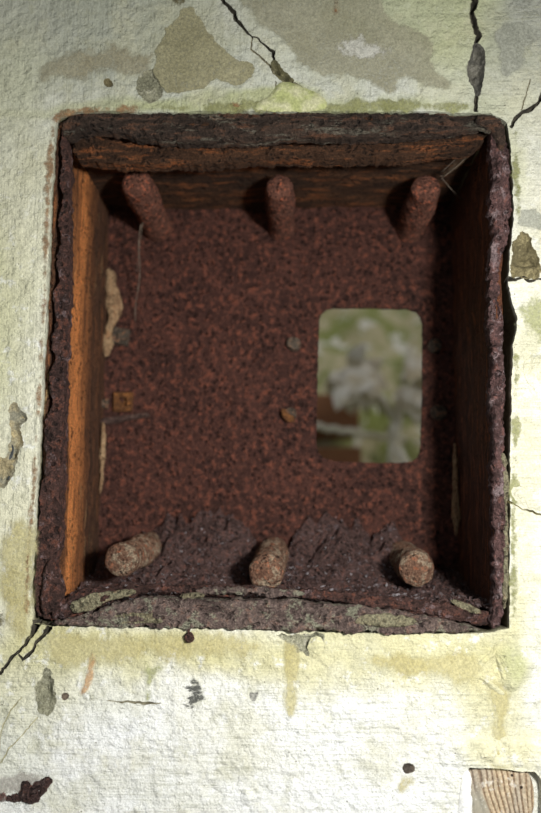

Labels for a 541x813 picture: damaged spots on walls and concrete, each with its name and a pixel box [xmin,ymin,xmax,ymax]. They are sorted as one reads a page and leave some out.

peeling [136,7,255,103]
crack [221,0,304,88]
leakage [242,0,449,93]
crack [469,0,482,46]
crack [509,80,541,128]
corrosion [43,144,54,258]
flaking render [510,209,541,280]
flaking render [0,402,28,488]
crack [0,619,53,675]
leakage [50,634,257,664]
leakage [183,680,206,708]
leakage [285,645,299,714]